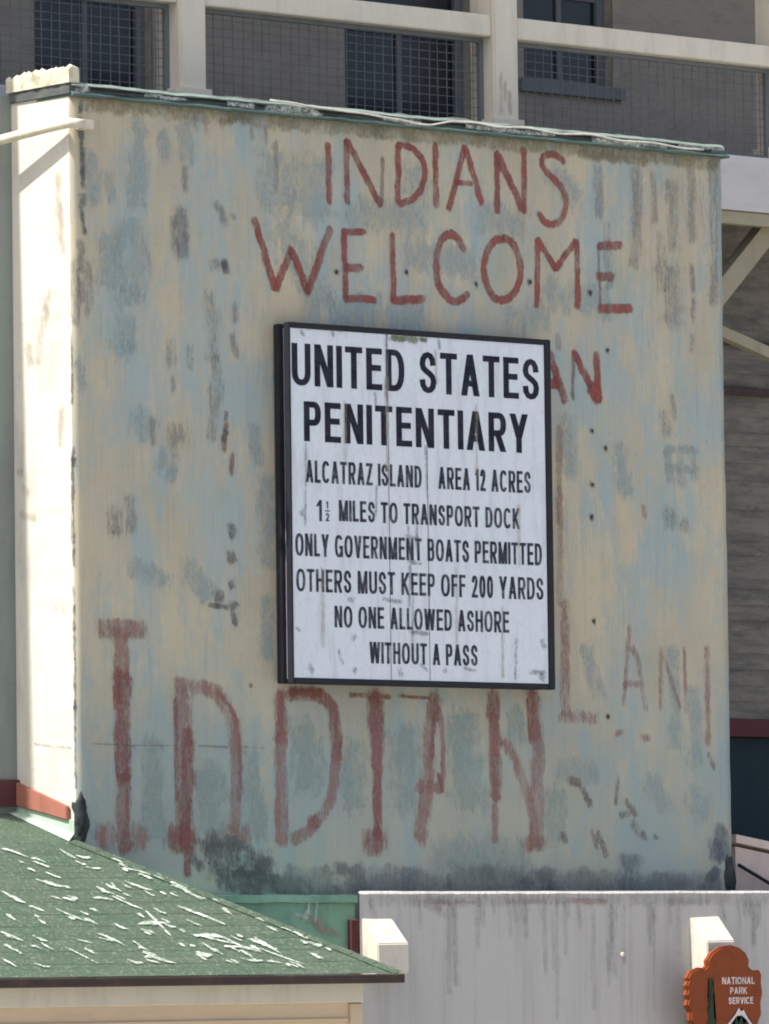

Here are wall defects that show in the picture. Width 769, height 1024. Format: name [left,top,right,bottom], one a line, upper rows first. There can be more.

damp [192,836,419,920]
damp [473,826,730,891]